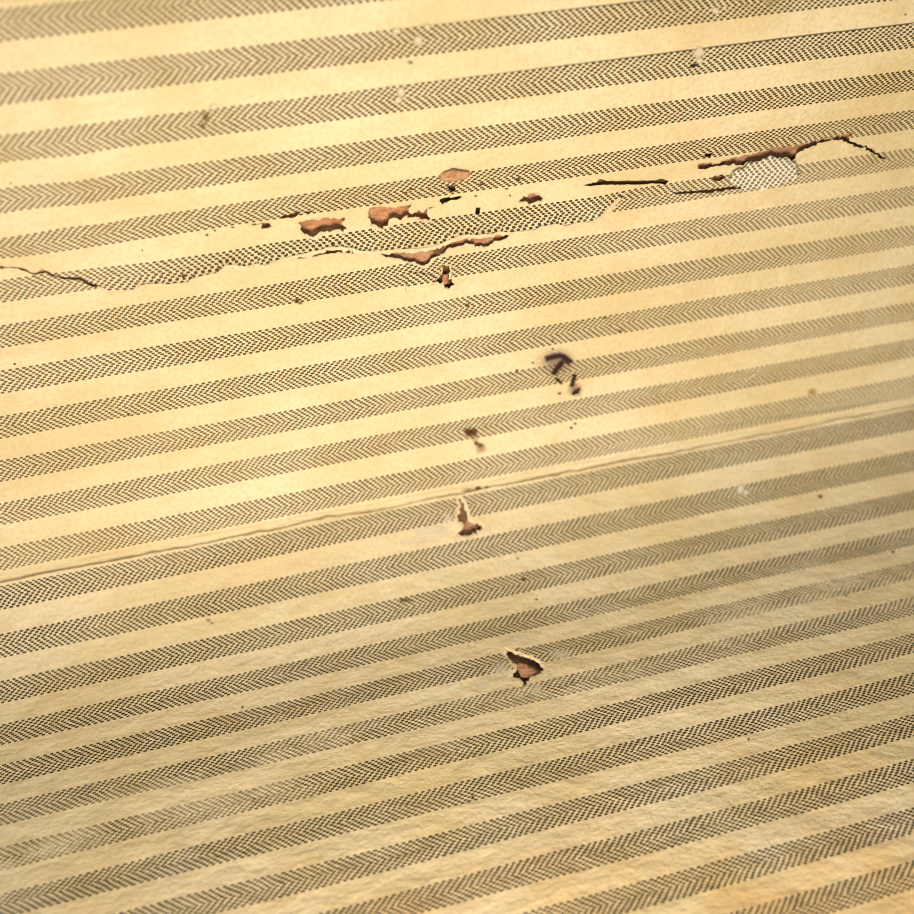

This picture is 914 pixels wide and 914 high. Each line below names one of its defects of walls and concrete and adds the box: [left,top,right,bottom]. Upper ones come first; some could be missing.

peeling [439,169,470,182]
crack [0,265,98,287]
peeling [405,272,436,294]